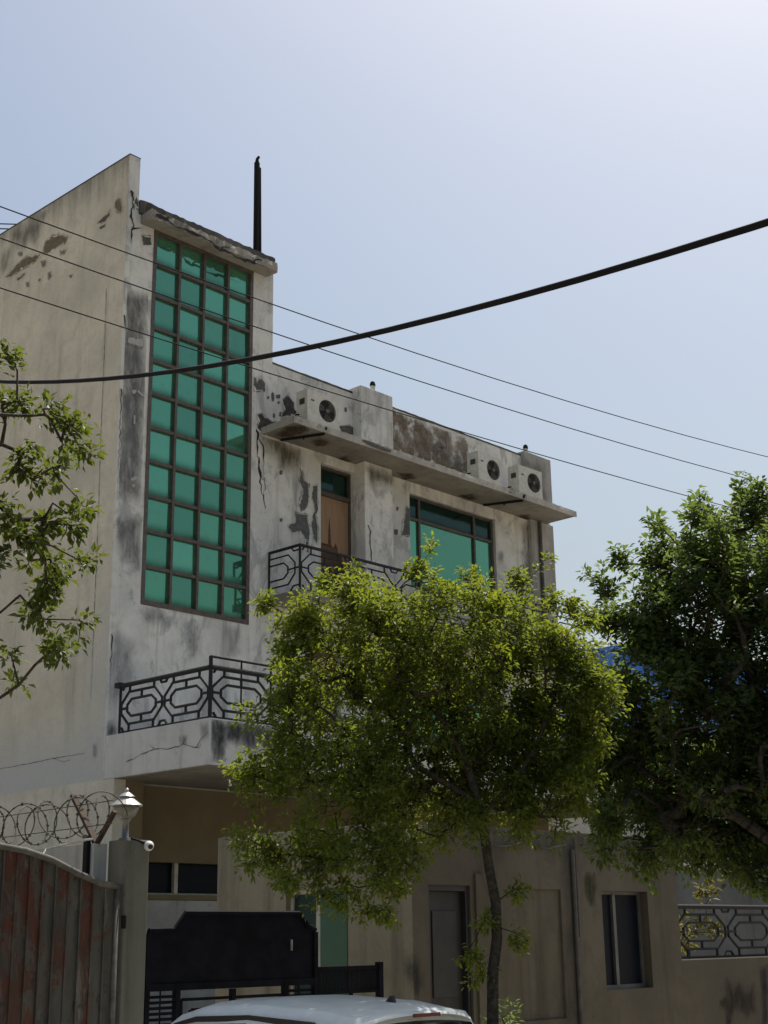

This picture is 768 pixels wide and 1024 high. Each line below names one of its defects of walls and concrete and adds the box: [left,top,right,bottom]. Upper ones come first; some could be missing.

peeling [5,234,68,287]
peeling [97,195,139,229]
peeling [141,235,152,247]
crack [130,190,269,269]
peeling [253,376,296,432]
crack [256,429,266,508]
peeling [280,466,319,554]
crack [126,735,205,762]